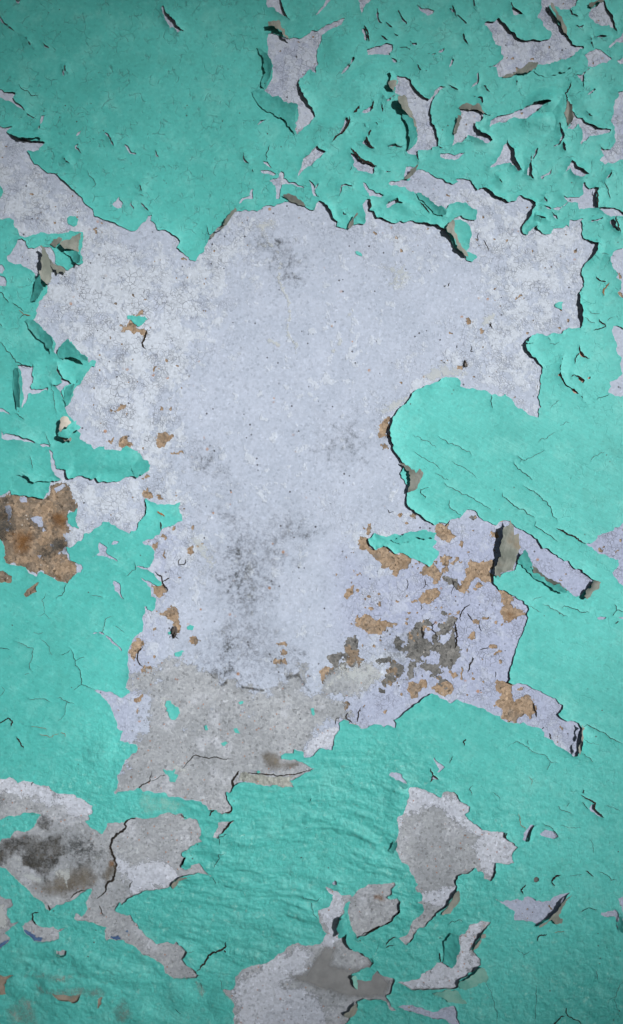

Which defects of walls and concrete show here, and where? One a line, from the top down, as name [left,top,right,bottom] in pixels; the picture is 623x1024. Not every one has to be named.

peeling [162,6,183,32]
peeling [252,0,345,134]
peeling [485,0,623,95]
peeling [0,28,623,839]
crack [415,253,612,544]
crack [0,585,95,748]
leakage [0,820,114,892]
peeling [0,781,211,978]
peeling [223,881,491,1024]
peeling [388,772,559,945]
peeling [496,893,572,927]